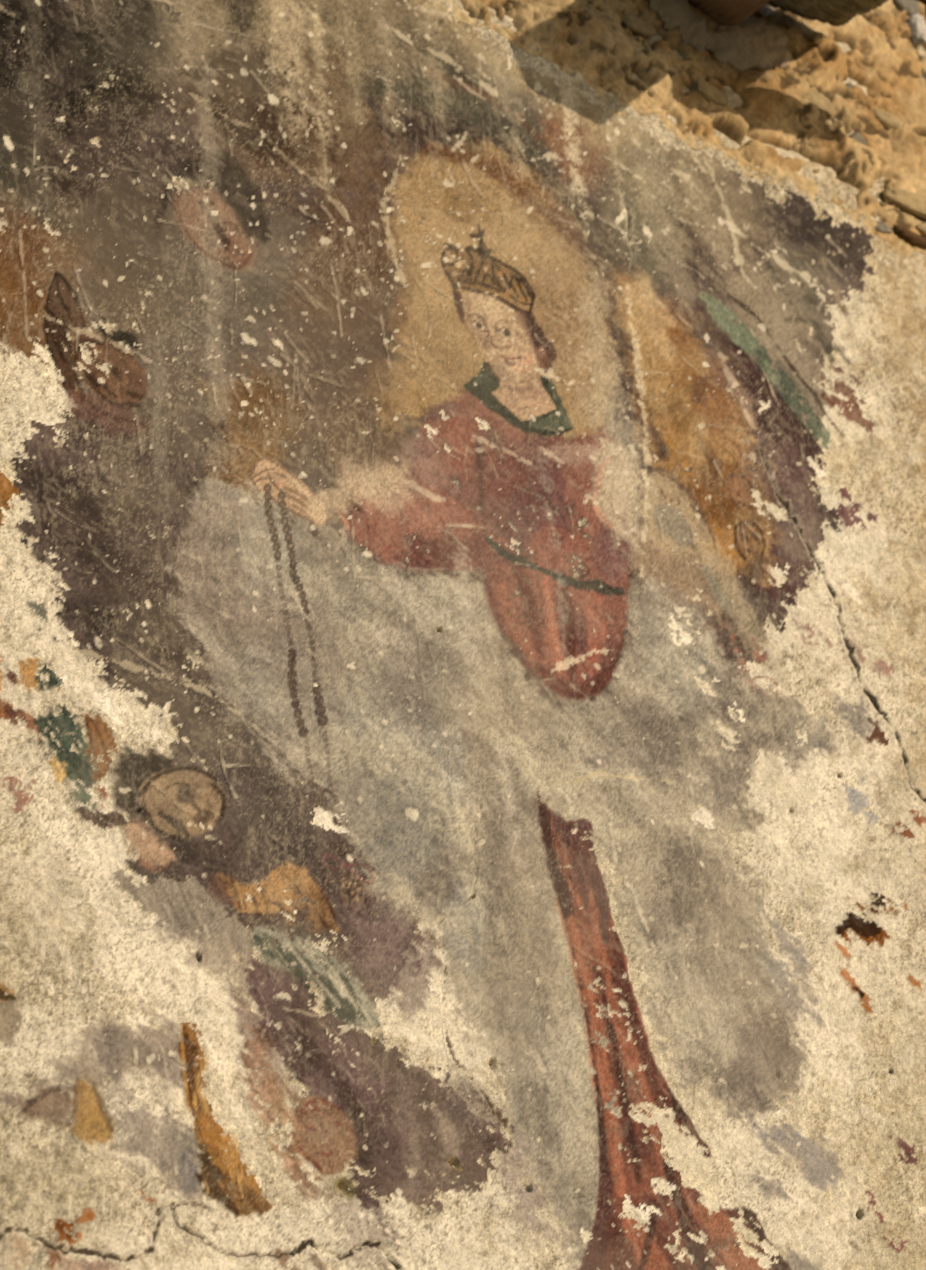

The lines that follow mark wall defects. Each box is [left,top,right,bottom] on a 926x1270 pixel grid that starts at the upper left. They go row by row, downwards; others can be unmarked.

peeling [210,35,348,149]
peeling [2,134,45,230]
peeling [0,492,79,594]
peeling [31,569,219,772]
peeling [660,581,820,843]
crack [755,437,926,849]
peeling [837,707,891,814]
peeling [890,808,926,841]
peeling [271,988,293,1003]
peeling [885,1133,924,1171]
crack [0,1197,414,1270]
peeling [855,1188,911,1254]